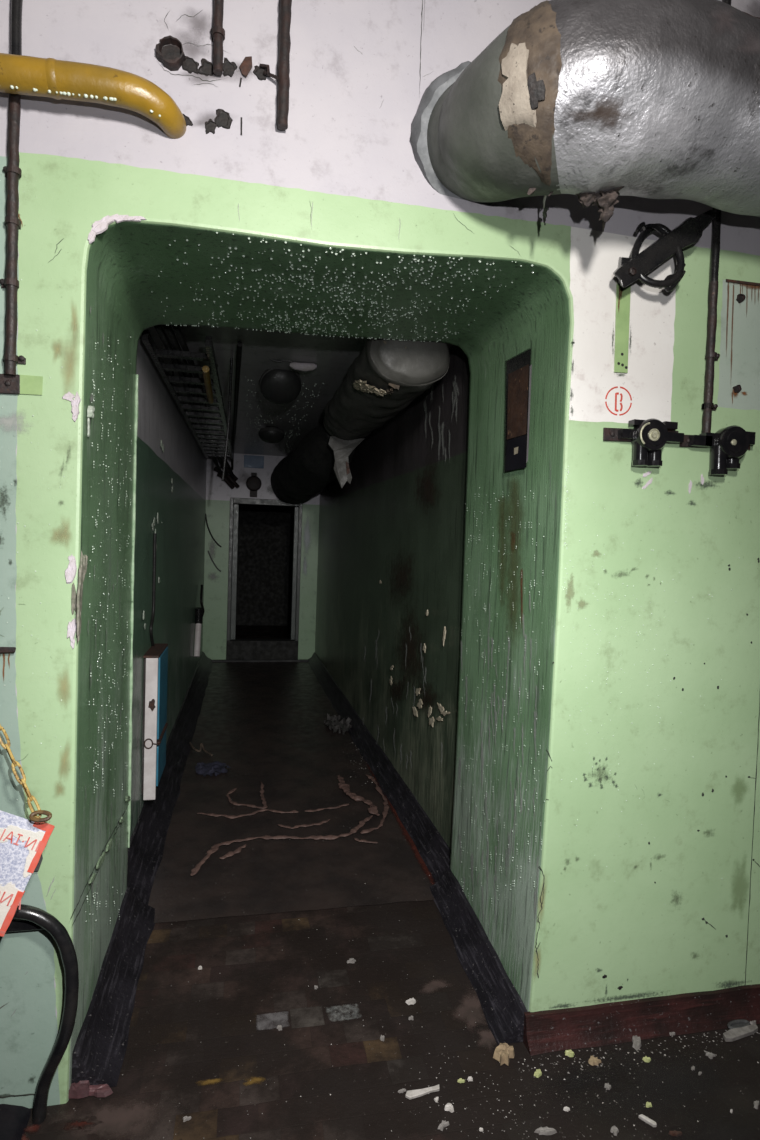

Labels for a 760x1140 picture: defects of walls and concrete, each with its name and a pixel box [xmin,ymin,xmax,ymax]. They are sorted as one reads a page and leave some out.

flaking render [88,214,146,244]
corrosion [726,279,760,370]
flaking render [62,392,95,437]
peeling [65,550,88,649]
peeling [412,688,451,727]
crack [0,1092,35,1100]